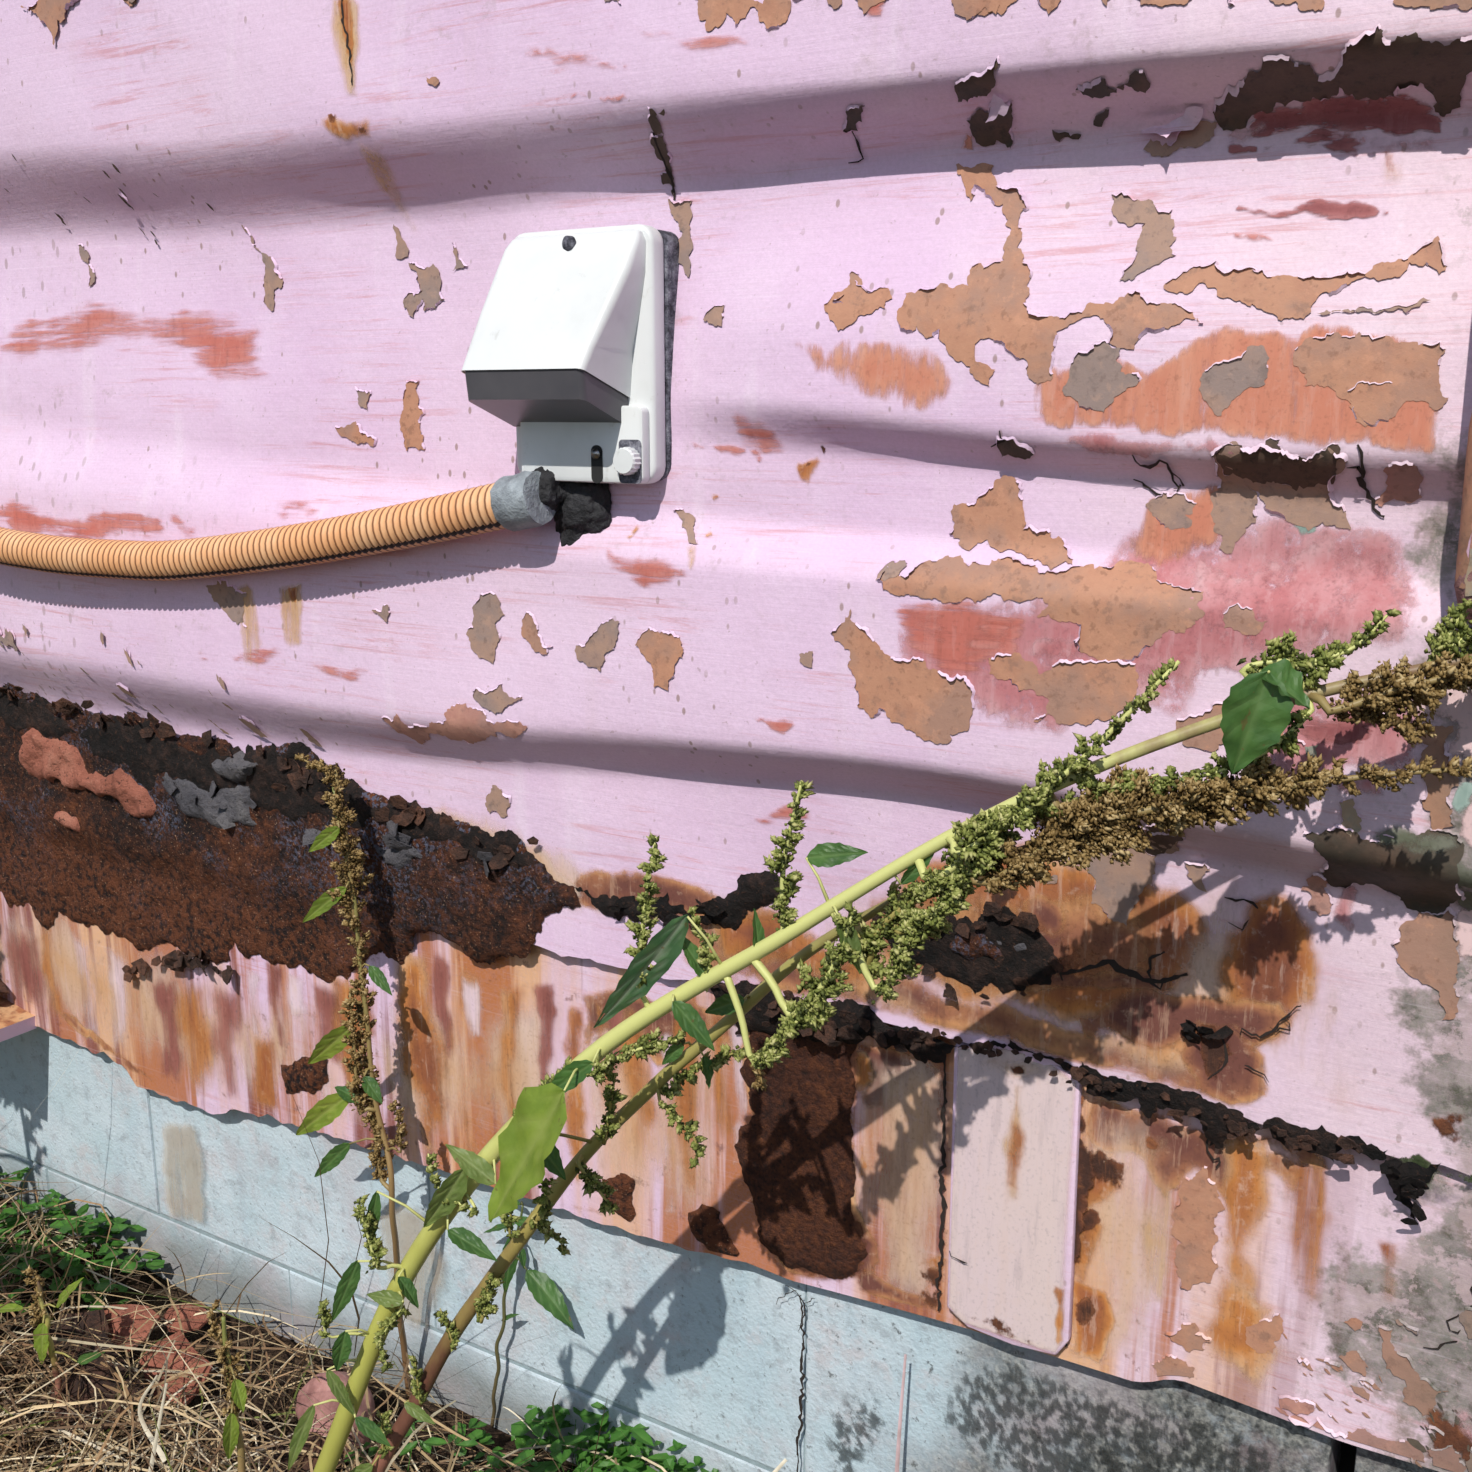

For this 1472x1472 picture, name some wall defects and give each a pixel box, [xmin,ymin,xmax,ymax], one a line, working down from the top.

peeling [697,0,800,31]
peeling [951,0,1016,21]
peeling [1141,23,1472,157]
peeling [824,55,1447,416]
peeling [991,431,1035,460]
peeling [1132,437,1423,554]
peeling [1293,332,1448,427]
peeling [876,475,1205,726]
peeling [831,609,976,744]
peeling [485,785,511,818]
rust [0,682,1441,1380]
peeling [1272,1286,1472,1472]